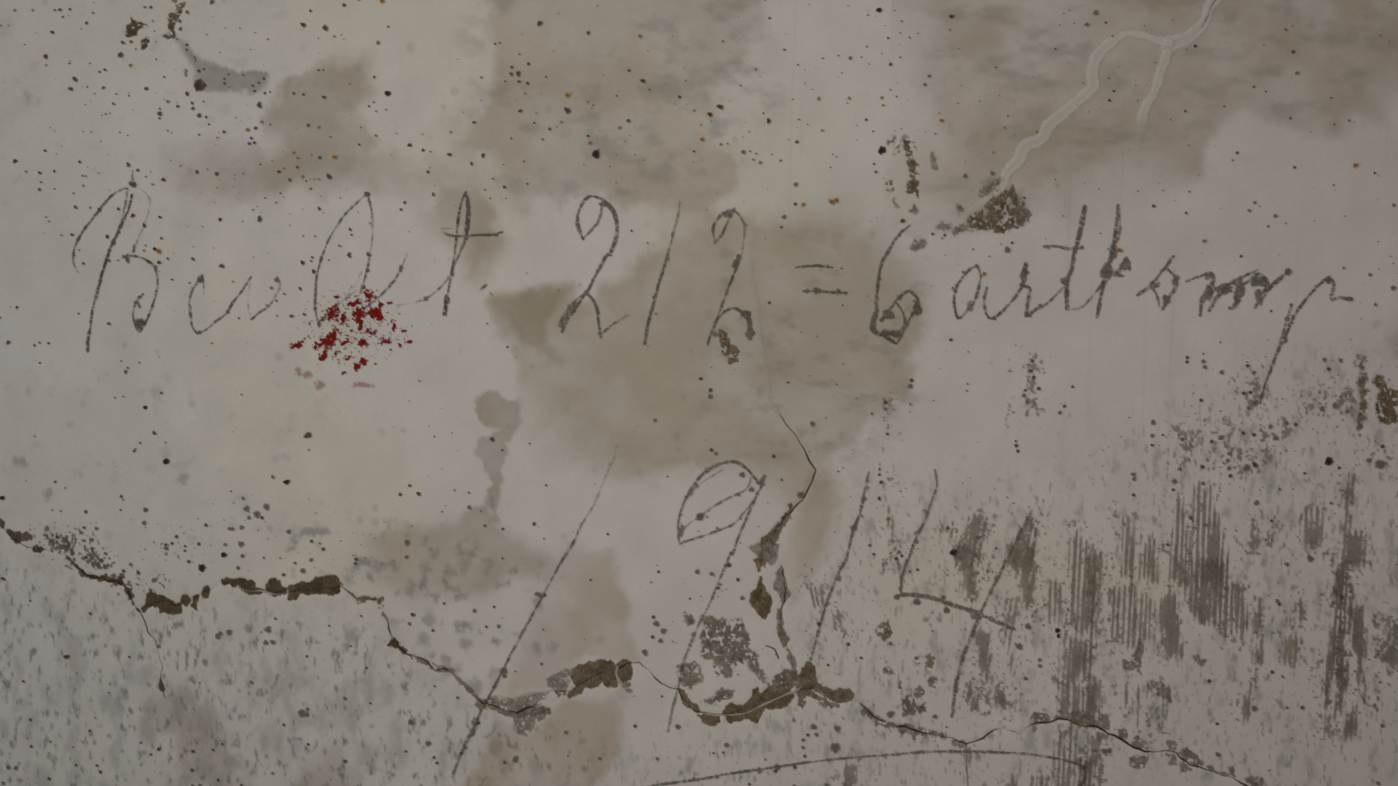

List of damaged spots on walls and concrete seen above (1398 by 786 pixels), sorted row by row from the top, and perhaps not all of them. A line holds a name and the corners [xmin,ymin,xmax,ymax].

crack [972,0,1222,211]
flaking render [937,171,1031,253]
crack [0,383,995,771]
flaking render [678,615,767,704]
crack [1031,710,1263,786]